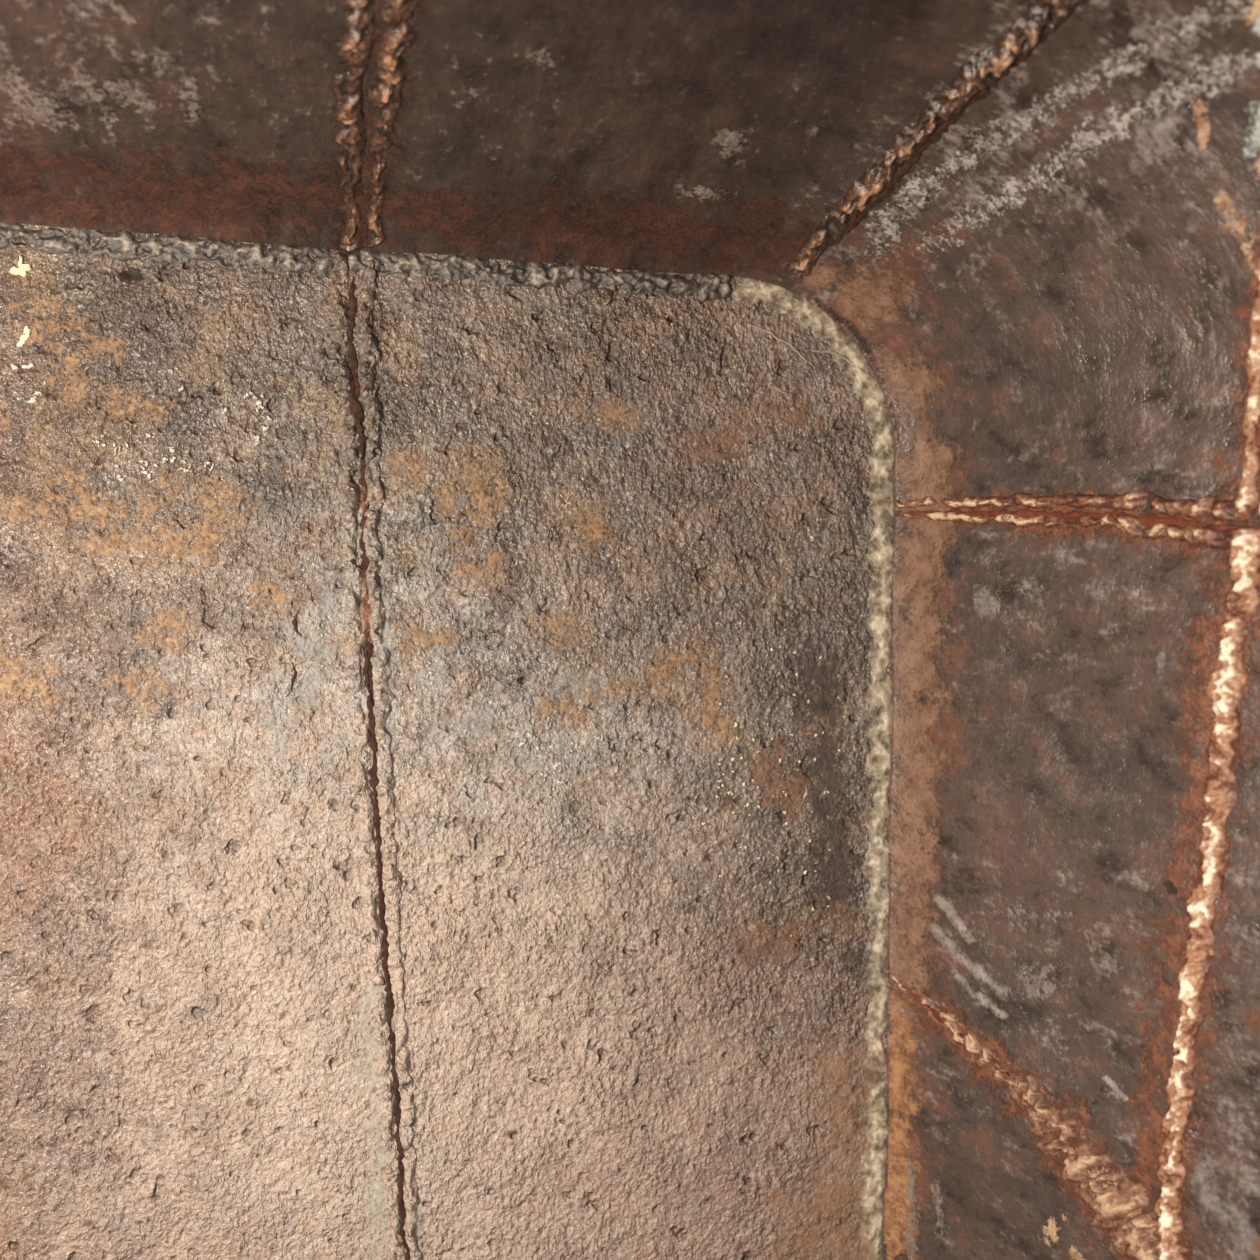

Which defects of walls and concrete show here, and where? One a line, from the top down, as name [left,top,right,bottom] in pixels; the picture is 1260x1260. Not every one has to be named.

crack [833,15,1070,245]
water stain [864,0,1260,259]
crack [903,508,1241,530]
crack [1252,391,1260,477]
crack [345,278,411,1260]
crack [892,980,1010,1077]